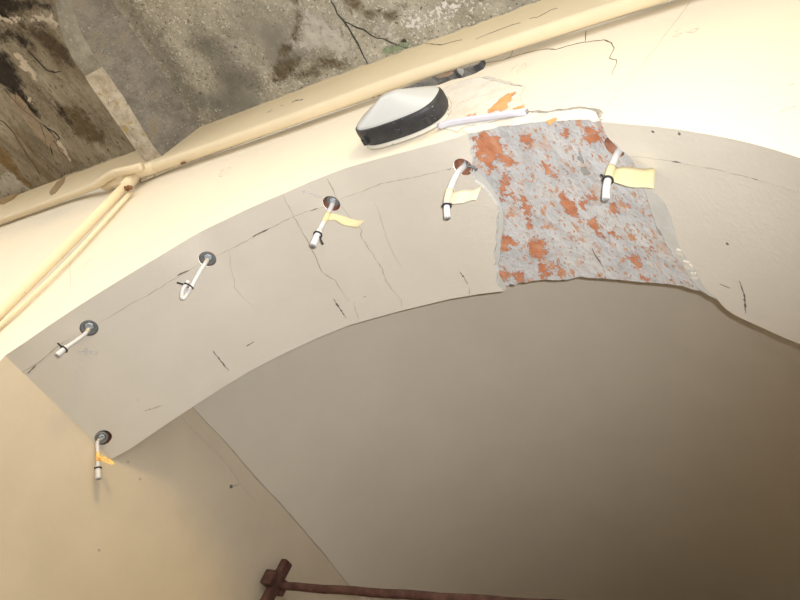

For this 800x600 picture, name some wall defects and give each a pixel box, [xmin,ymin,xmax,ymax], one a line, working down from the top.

water stain [0,0,74,117]
crack [330,0,556,64]
water stain [54,101,104,144]
water stain [0,169,30,198]
spalling [402,60,718,300]
crack [629,156,798,192]
crack [217,168,453,321]
crack [104,264,199,320]